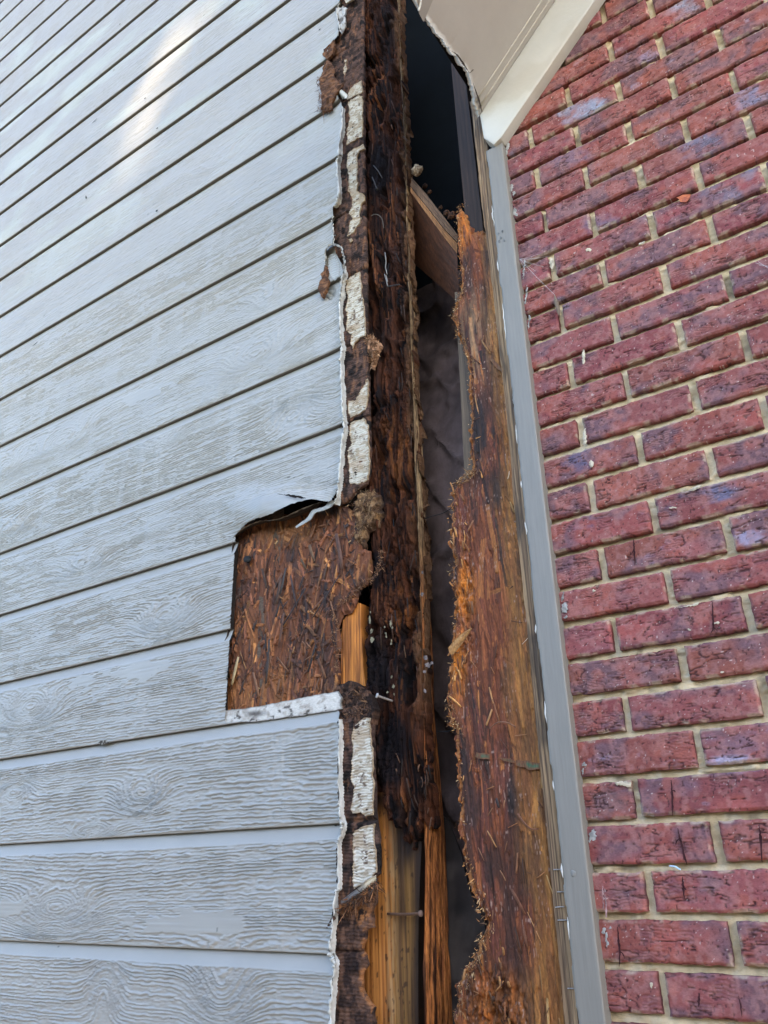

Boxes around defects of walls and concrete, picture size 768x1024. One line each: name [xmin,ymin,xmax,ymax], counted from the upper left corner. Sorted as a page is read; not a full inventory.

peeling [318,81,371,506]
peeling [327,718,378,1024]